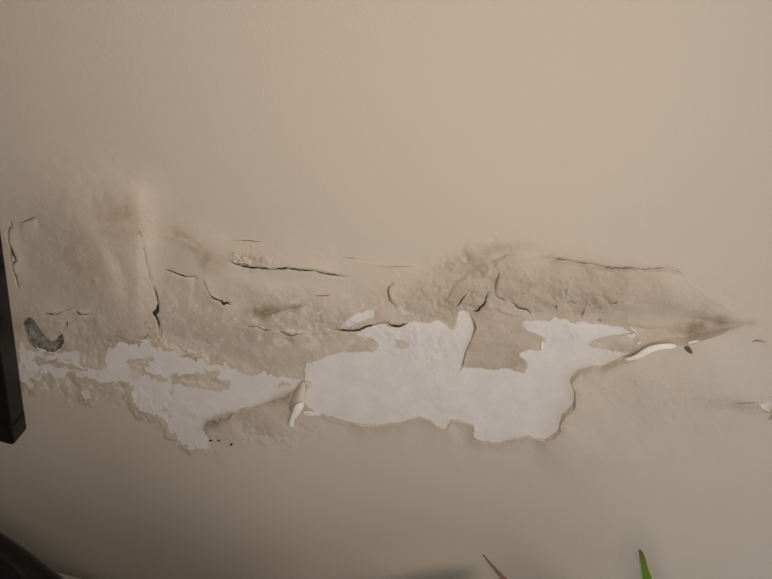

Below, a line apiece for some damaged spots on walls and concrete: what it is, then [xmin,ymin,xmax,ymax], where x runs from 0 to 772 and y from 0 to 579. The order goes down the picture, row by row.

crack [137,231,194,340]
crack [248,326,298,336]
crack [233,257,354,277]
peeling [15,309,772,486]